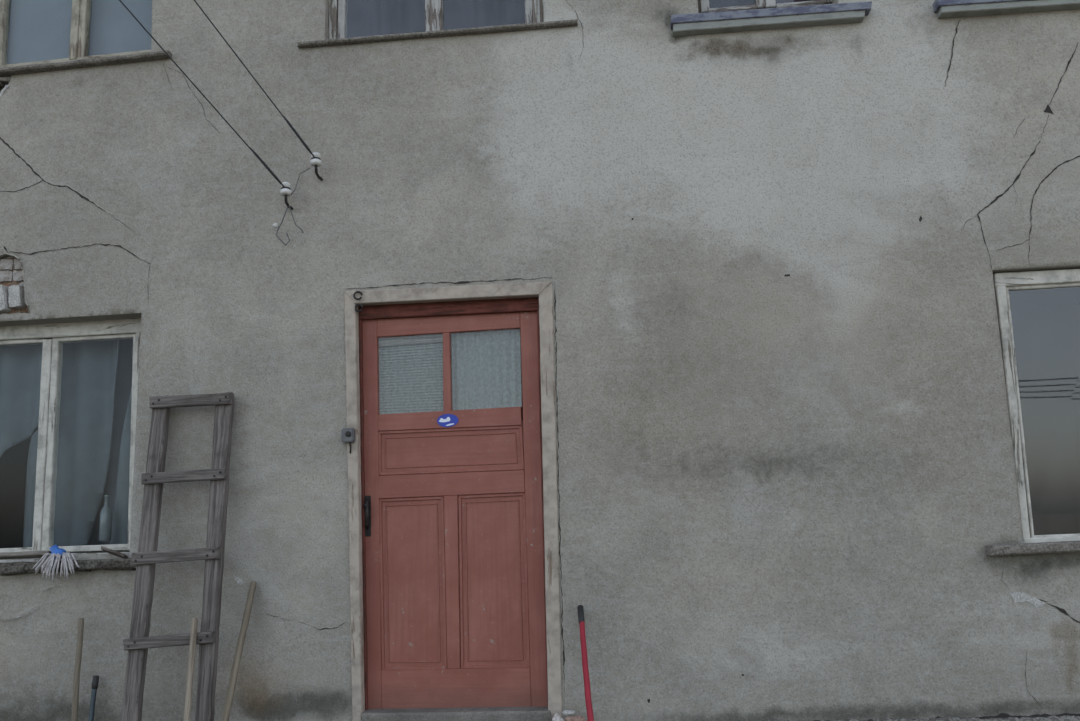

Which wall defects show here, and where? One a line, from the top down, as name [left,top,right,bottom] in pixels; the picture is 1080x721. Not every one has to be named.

spalling [0,77,11,97]
crack [944,20,961,87]
crack [962,42,1080,269]
crack [0,136,154,304]
spalling [0,253,30,315]
flaking render [0,565,136,636]
crack [1037,598,1080,623]
crack [912,651,1080,720]